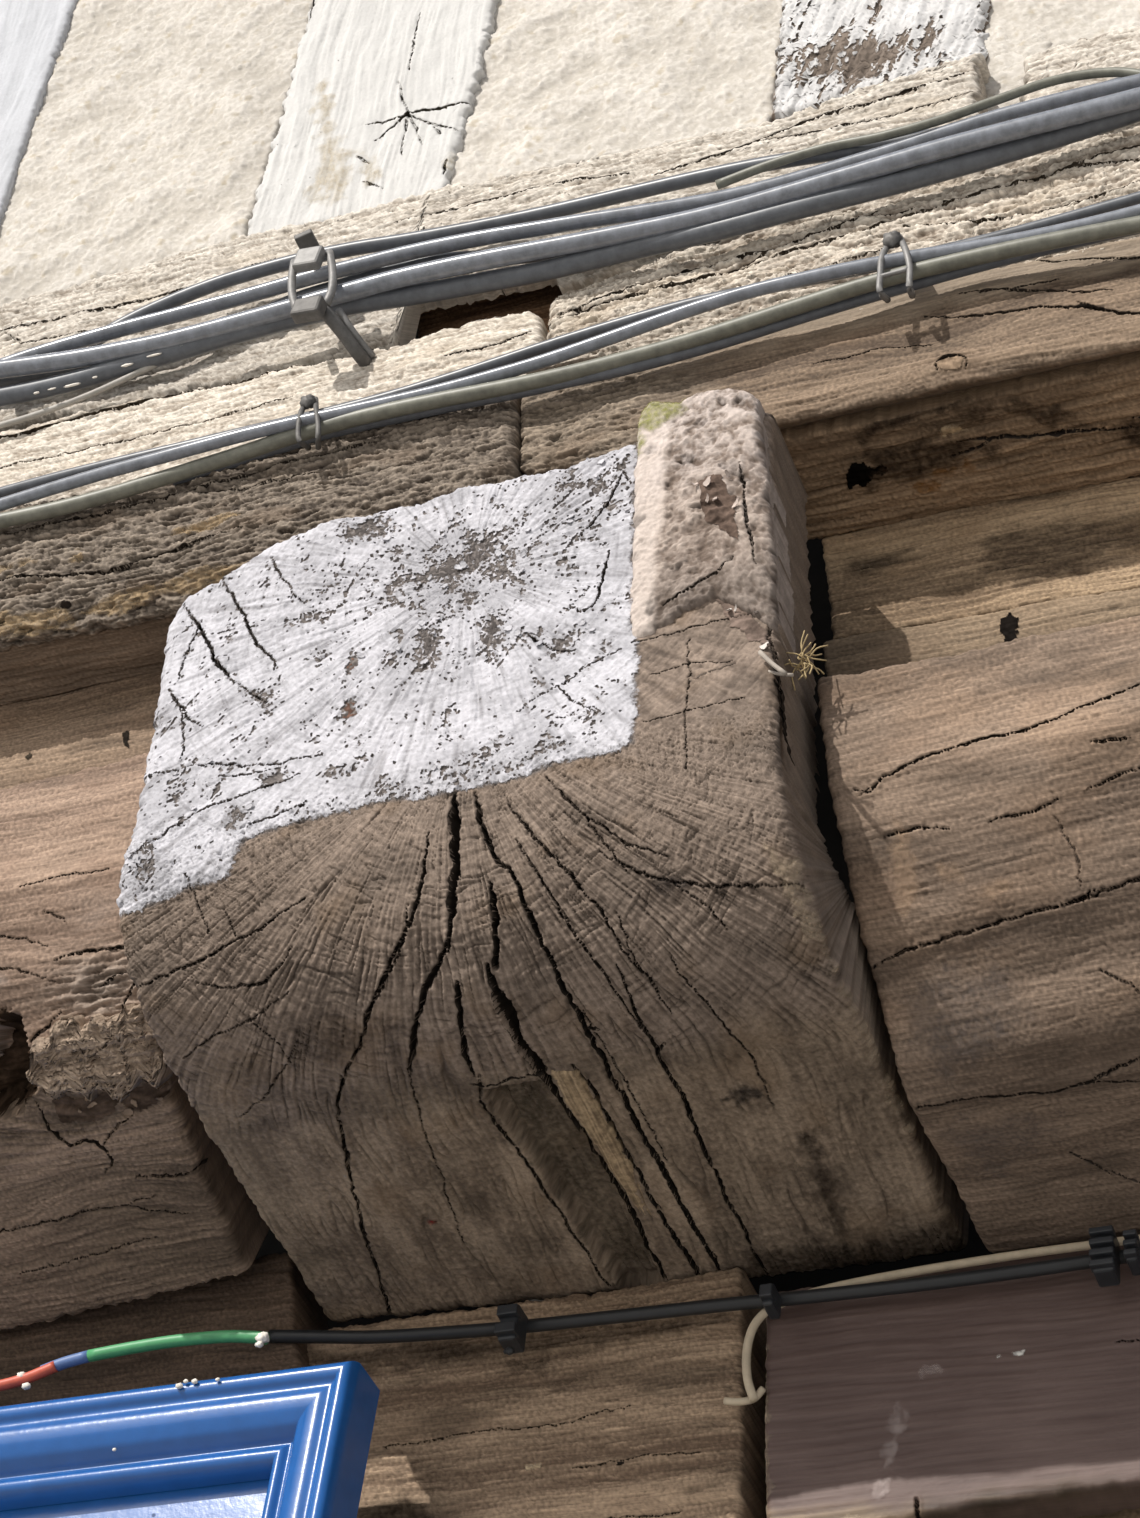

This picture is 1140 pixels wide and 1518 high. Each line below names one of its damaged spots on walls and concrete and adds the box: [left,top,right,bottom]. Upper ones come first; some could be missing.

crack [357,12,972,223]
spalling [0,561,249,637]
peeling [342,696,356,718]
peeling [412,617,442,675]
peeling [390,530,595,649]
crack [572,469,632,613]
crack [637,467,795,769]
crack [0,581,323,1117]
crack [854,684,1140,968]
spalling [0,1007,37,1115]
spalling [51,1080,170,1124]
crack [336,776,803,1312]